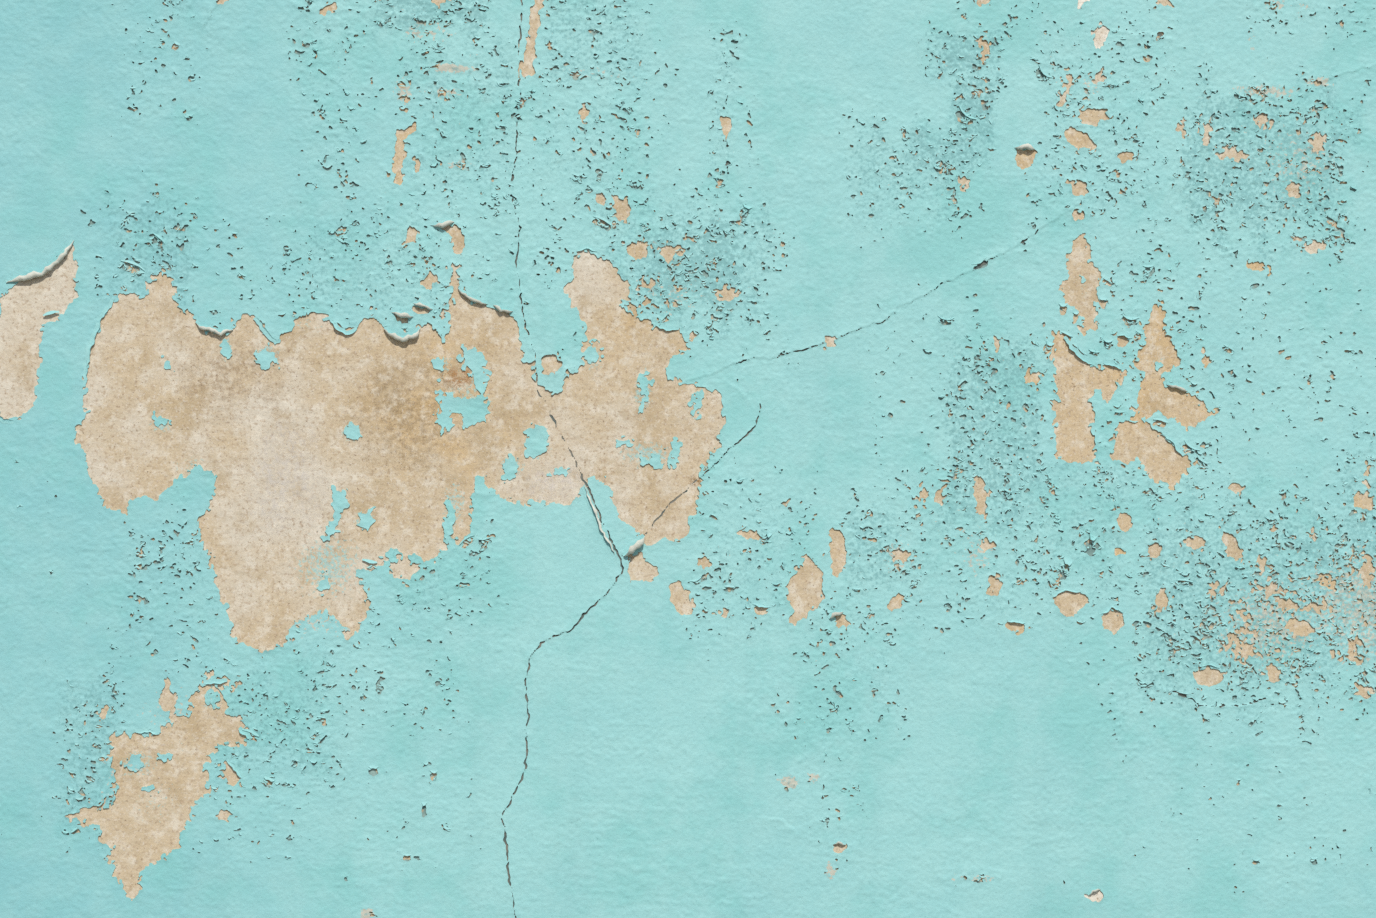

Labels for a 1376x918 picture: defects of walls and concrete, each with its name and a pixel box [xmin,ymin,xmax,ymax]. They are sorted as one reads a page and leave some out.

peeling [0,238,79,424]
peeling [52,0,788,900]
crack [387,0,761,918]
crack [736,316,890,364]
crack [924,229,1038,296]
peeling [669,0,1376,734]